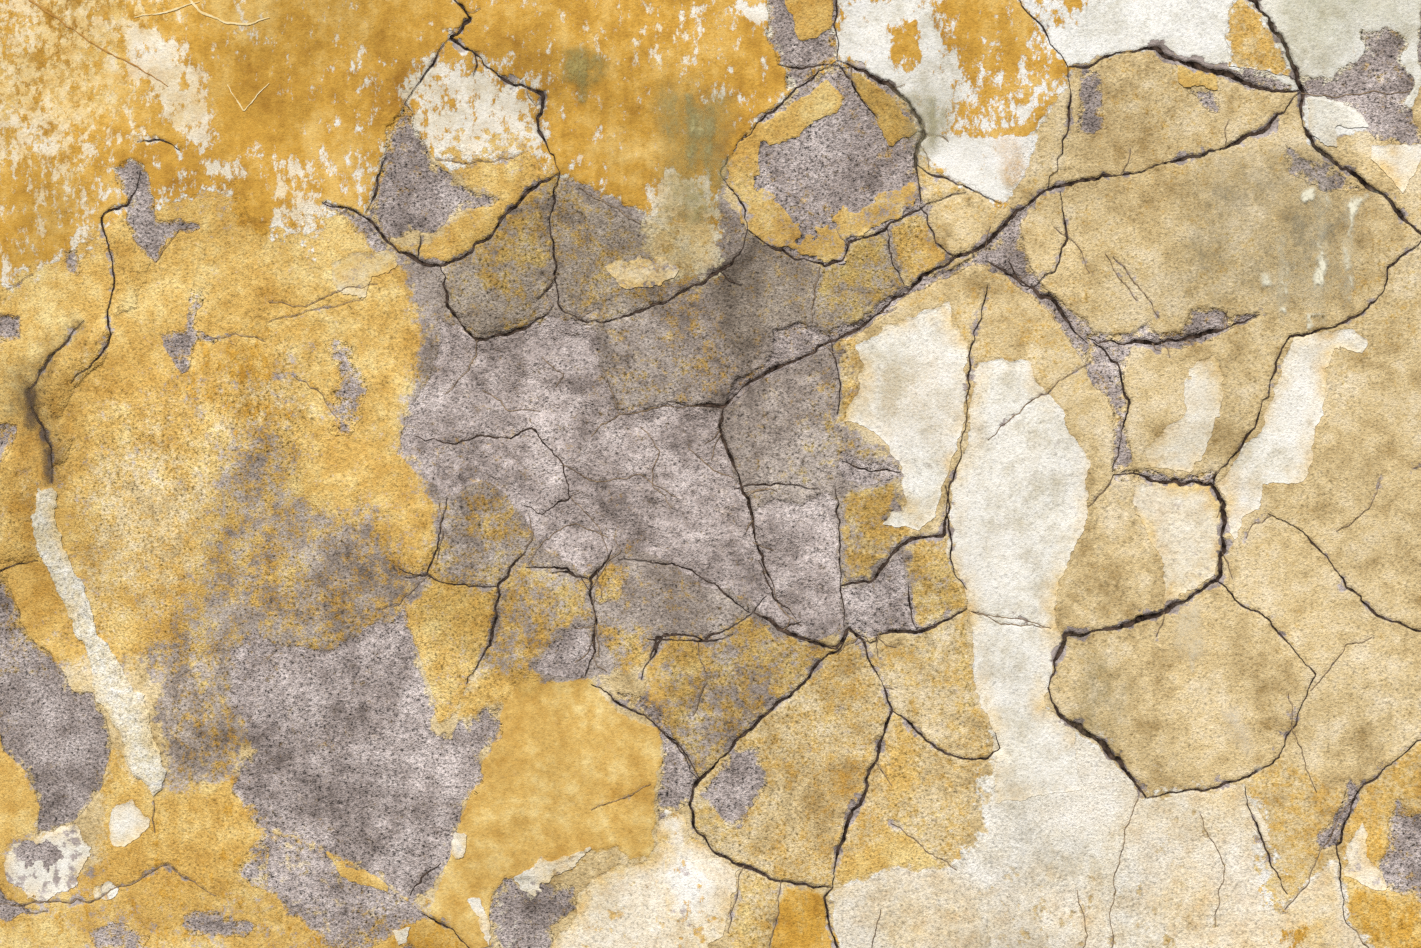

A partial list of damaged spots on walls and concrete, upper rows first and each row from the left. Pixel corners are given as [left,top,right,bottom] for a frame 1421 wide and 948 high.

crack [27,138,199,483]
crack [206,284,378,342]
crack [293,375,337,418]
spalling [322,104,499,298]
spalling [723,0,923,265]
crack [323,0,1421,948]
spalling [396,200,1368,803]
spalling [1175,0,1421,193]
spalling [0,571,118,921]
peeling [109,799,150,847]
spalling [227,607,503,948]
spalling [1316,778,1421,903]